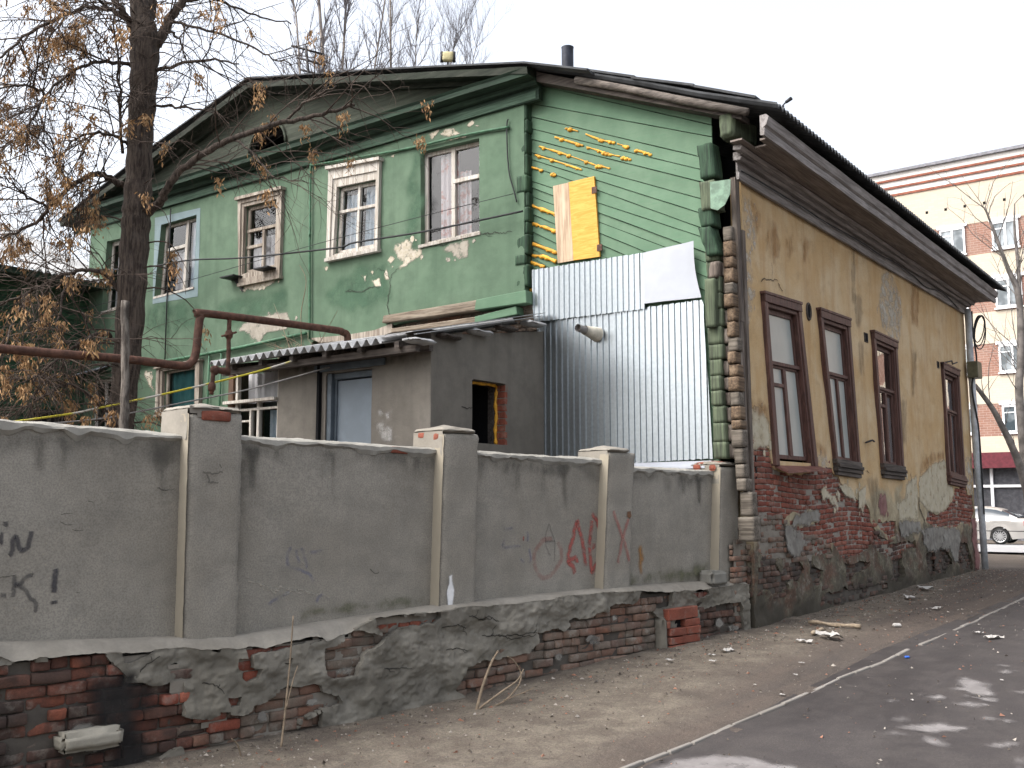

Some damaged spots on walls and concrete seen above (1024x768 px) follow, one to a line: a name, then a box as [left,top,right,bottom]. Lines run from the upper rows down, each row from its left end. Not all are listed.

peeling [430,121,478,140]
peeling [364,236,423,286]
peeling [445,238,475,262]
peeling [239,312,298,343]
spalling [745,404,980,606]
spalling [238,612,437,681]
crack [442,612,538,653]
spalling [448,592,669,696]
spalling [0,653,339,768]